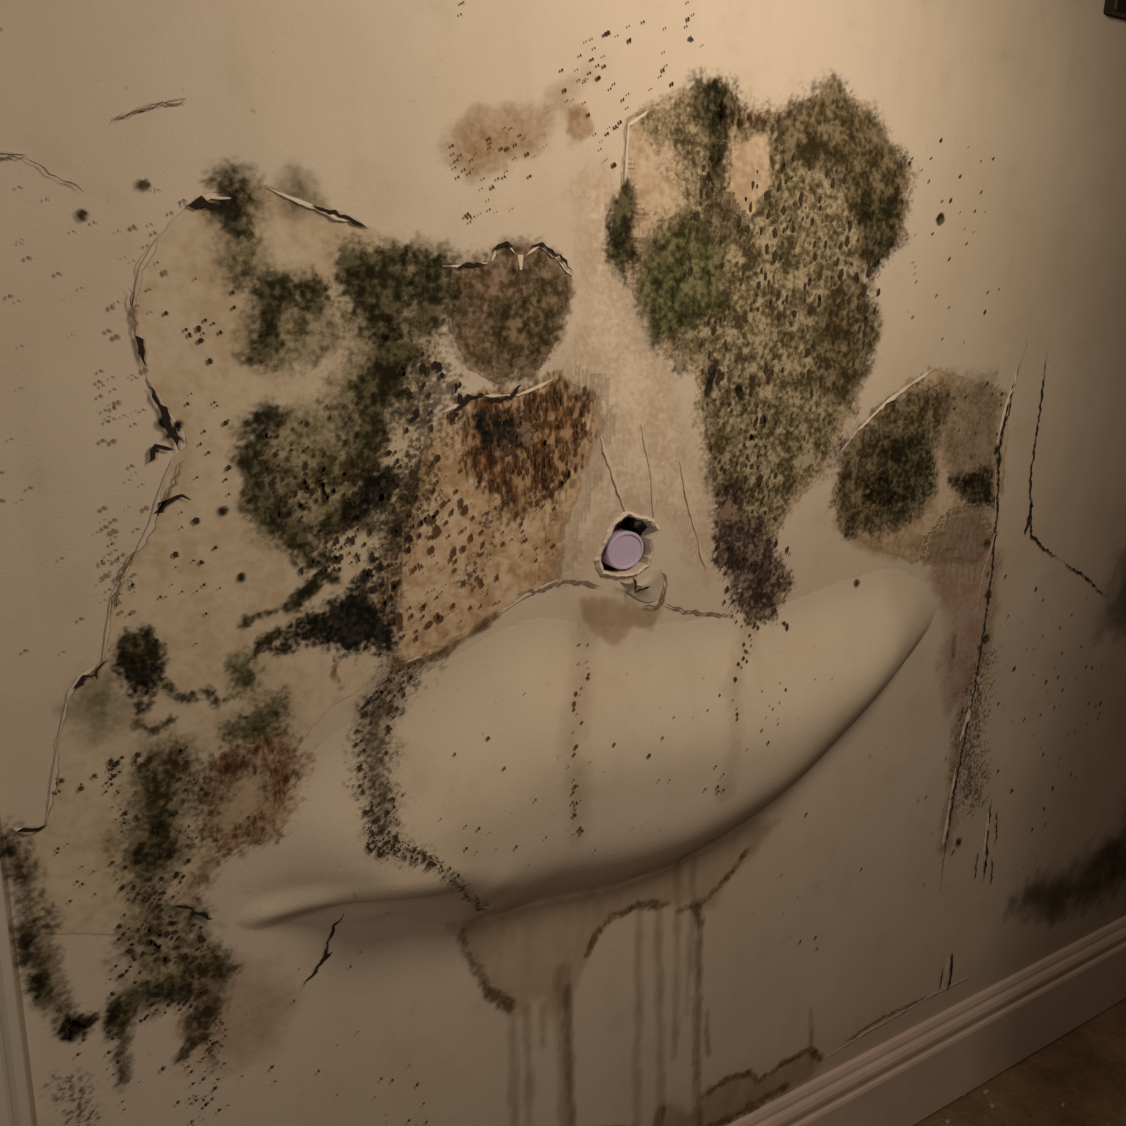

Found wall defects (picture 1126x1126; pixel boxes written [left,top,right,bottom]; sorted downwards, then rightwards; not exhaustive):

damp [577,20,645,90]
crack [0,150,83,192]
damp [605,51,1022,849]
peeling [11,83,1010,935]
damp [0,161,599,1126]
crack [940,349,1105,890]
crack [303,915,343,987]
damp [585,847,750,956]
damp [701,1047,823,1126]